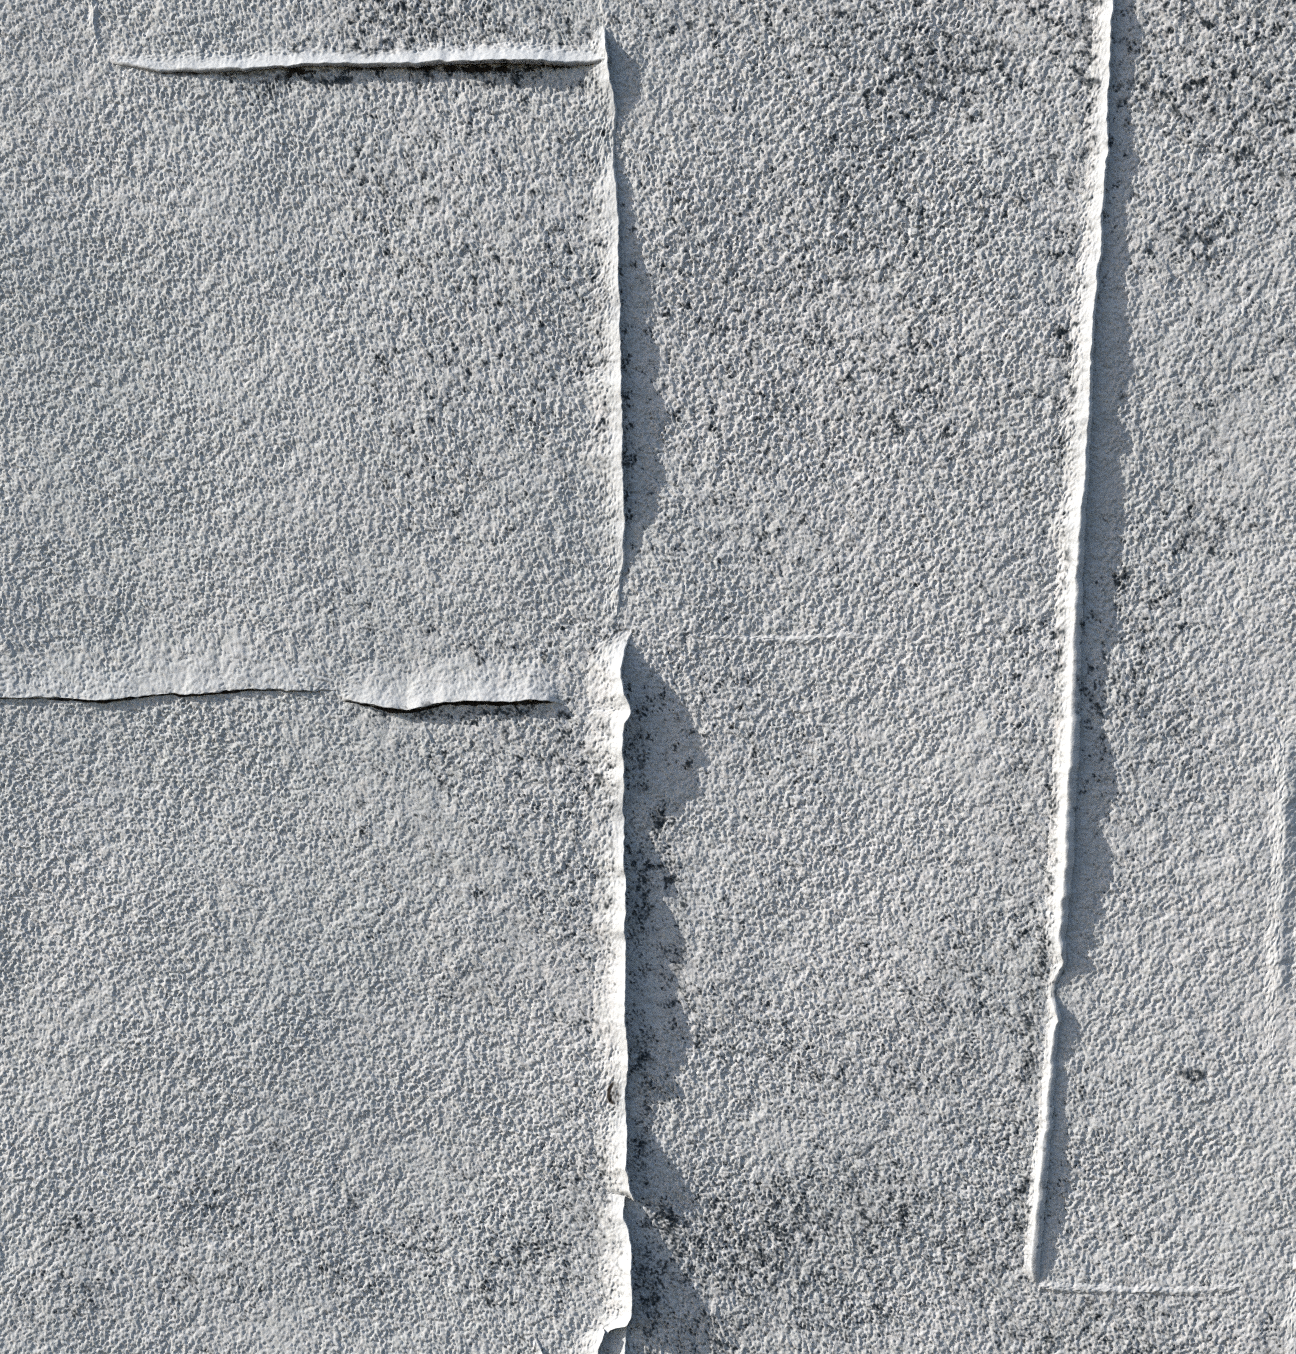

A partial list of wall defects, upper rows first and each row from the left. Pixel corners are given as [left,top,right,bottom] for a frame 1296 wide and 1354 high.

leakage [229,71,385,119]
leakage [318,0,592,134]
leakage [346,107,478,255]
leakage [397,242,557,422]
leakage [611,0,1296,577]
leakage [596,391,645,529]
crack [0,620,559,713]
leakage [1004,620,1065,717]
leakage [1078,478,1256,807]
leakage [405,667,1240,1354]